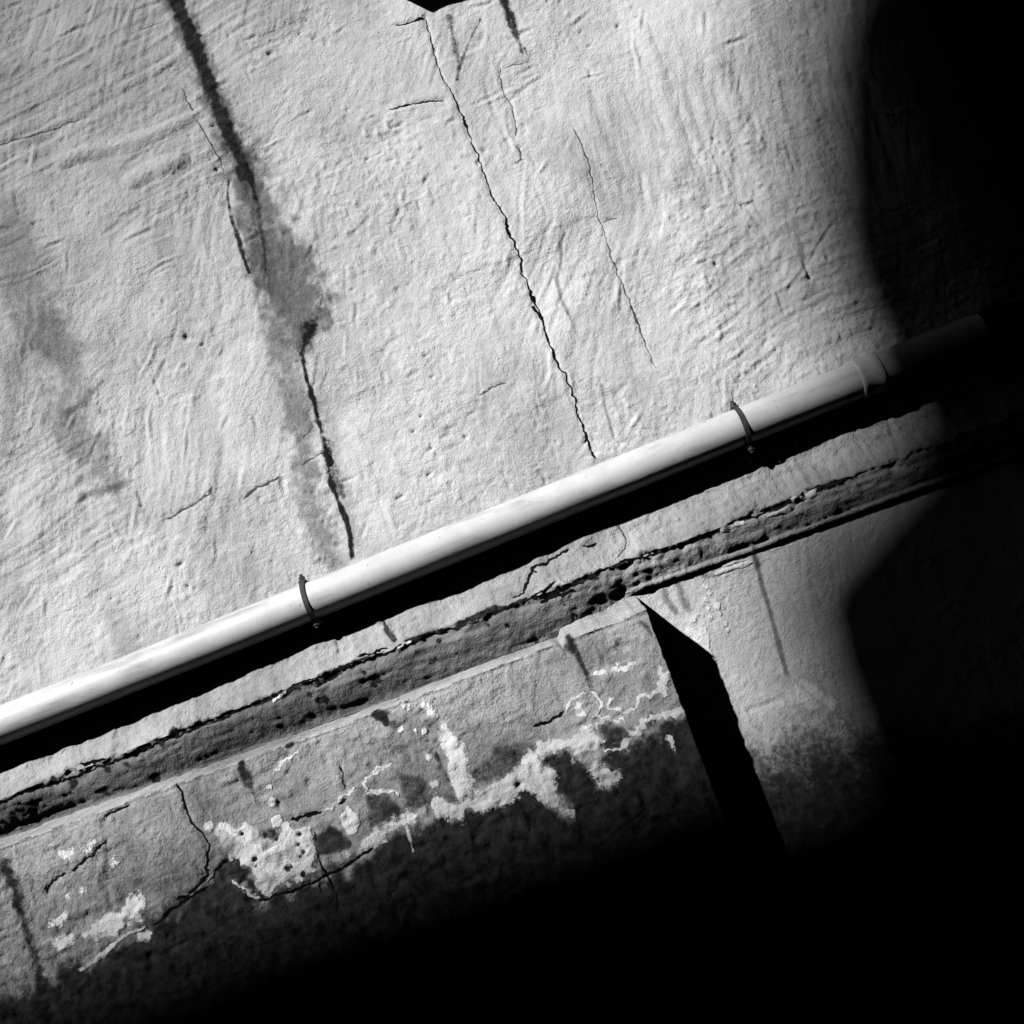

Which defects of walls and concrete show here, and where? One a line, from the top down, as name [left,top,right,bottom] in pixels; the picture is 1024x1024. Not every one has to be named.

water stain [163,0,354,559]
crack [391,17,596,458]
crack [574,130,654,365]
spalling [252,684,329,707]
crack [299,425,331,465]
crack [0,476,853,803]
spalling [397,598,528,649]
spalling [656,534,704,554]
peeling [714,558,753,575]
spalling [762,478,846,517]
crack [152,763,399,925]
water stain [0,547,1024,1024]